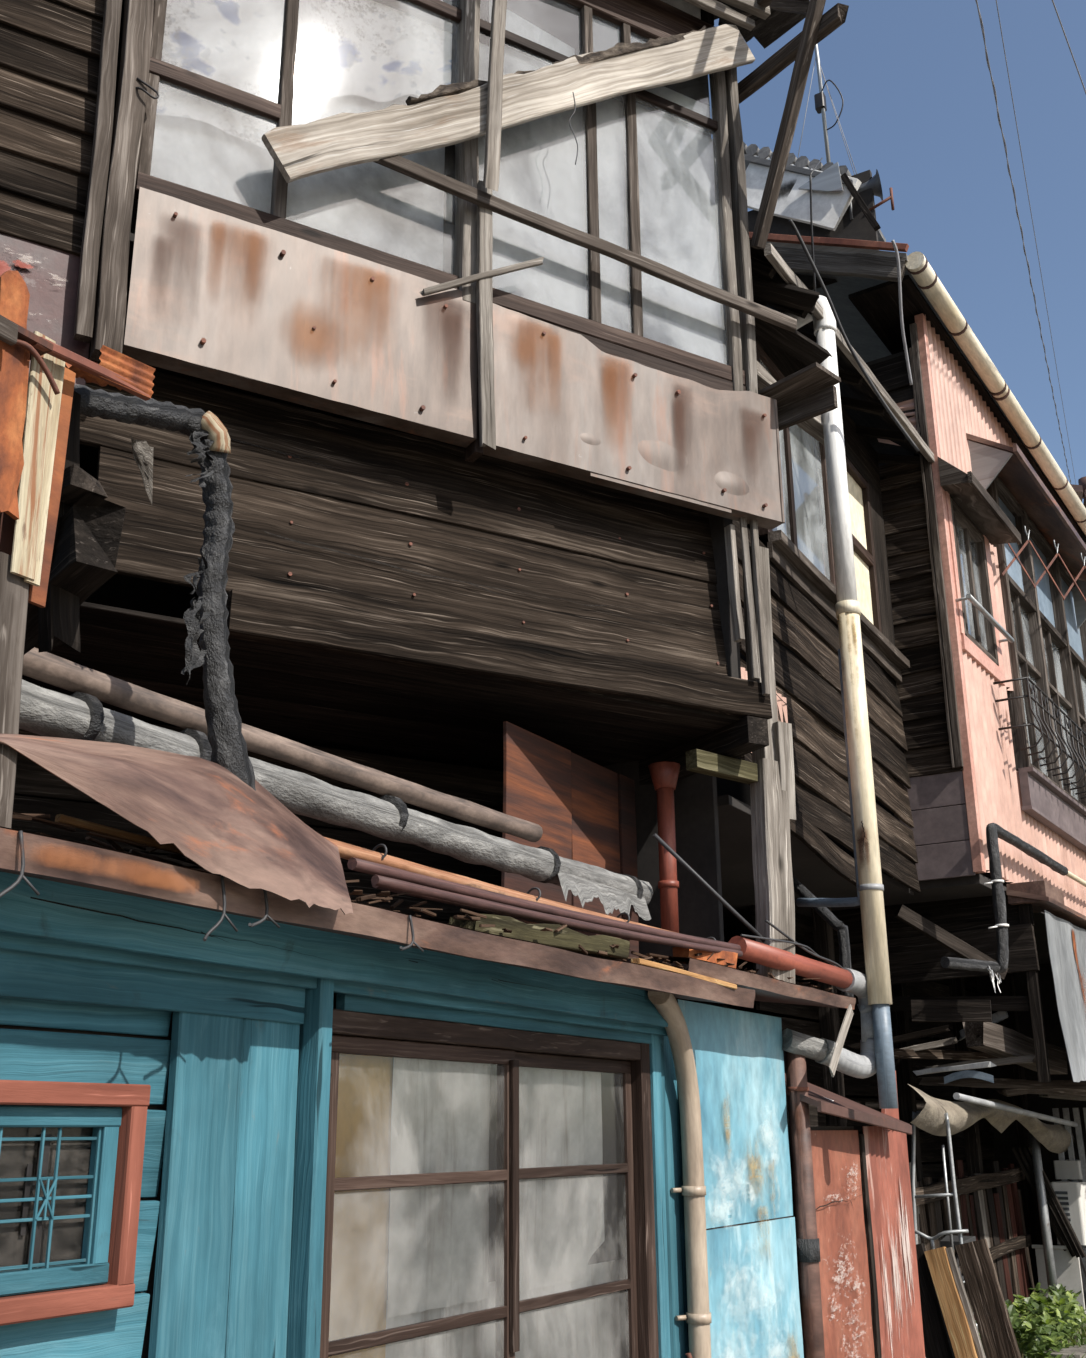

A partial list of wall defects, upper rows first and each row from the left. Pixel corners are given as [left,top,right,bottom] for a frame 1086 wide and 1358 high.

corrosion [41,848,193,890]